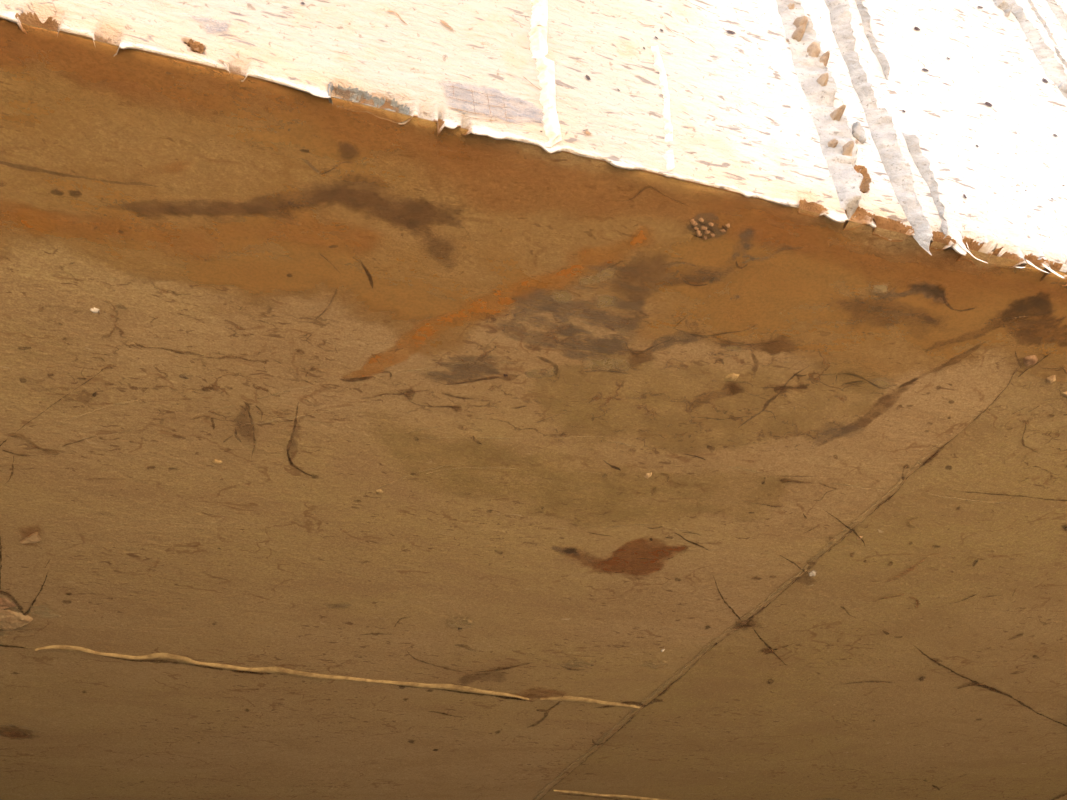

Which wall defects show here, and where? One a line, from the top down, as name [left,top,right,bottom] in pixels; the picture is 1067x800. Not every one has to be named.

spalling [327,83,410,122]
damp [0,18,573,354]
damp [604,191,1067,376]
spalling [854,165,872,193]
spalling [844,206,914,235]
spalling [930,231,1067,281]
crack [364,306,896,470]
damp [824,379,916,442]
rust [593,524,687,574]
crack [713,489,865,665]
crack [551,644,716,789]
crack [883,631,1067,727]